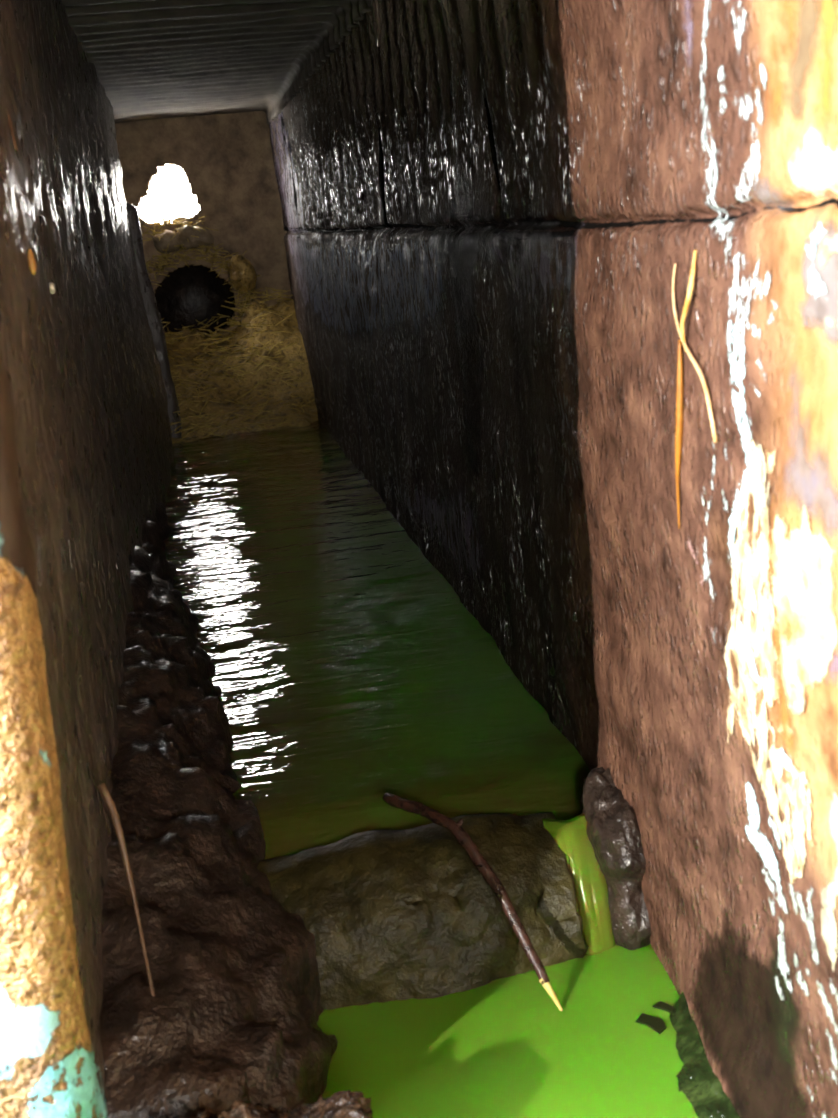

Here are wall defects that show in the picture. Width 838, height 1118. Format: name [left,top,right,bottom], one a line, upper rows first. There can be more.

corrosion [771,0,835,119]
peeling [802,222,838,342]
peeling [0,556,108,1118]
peeling [725,436,838,884]